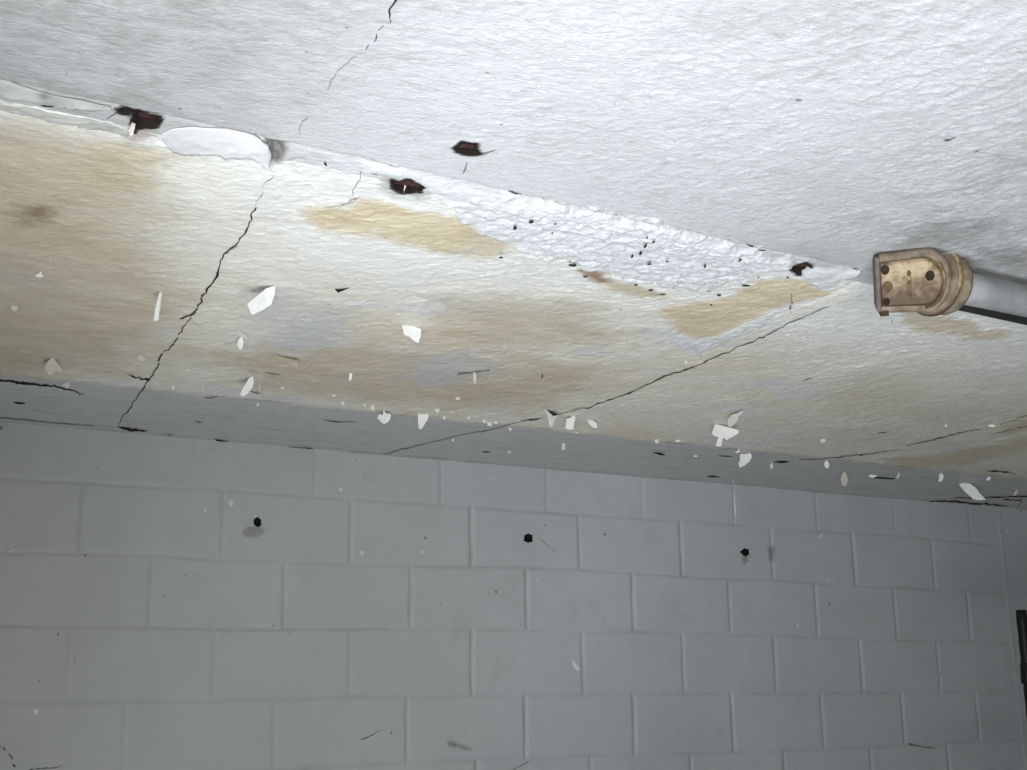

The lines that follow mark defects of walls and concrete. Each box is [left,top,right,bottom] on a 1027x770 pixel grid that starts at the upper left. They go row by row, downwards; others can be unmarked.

crack [328,0,397,89]
damp [0,72,845,421]
crack [118,177,273,436]
peeling [247,285,276,315]
peeling [401,325,421,343]
crack [0,379,89,426]
peeling [545,409,597,433]
crack [383,294,828,455]
peeling [712,410,744,446]
damp [771,349,986,424]
damp [868,415,1027,472]
peeling [959,483,986,500]